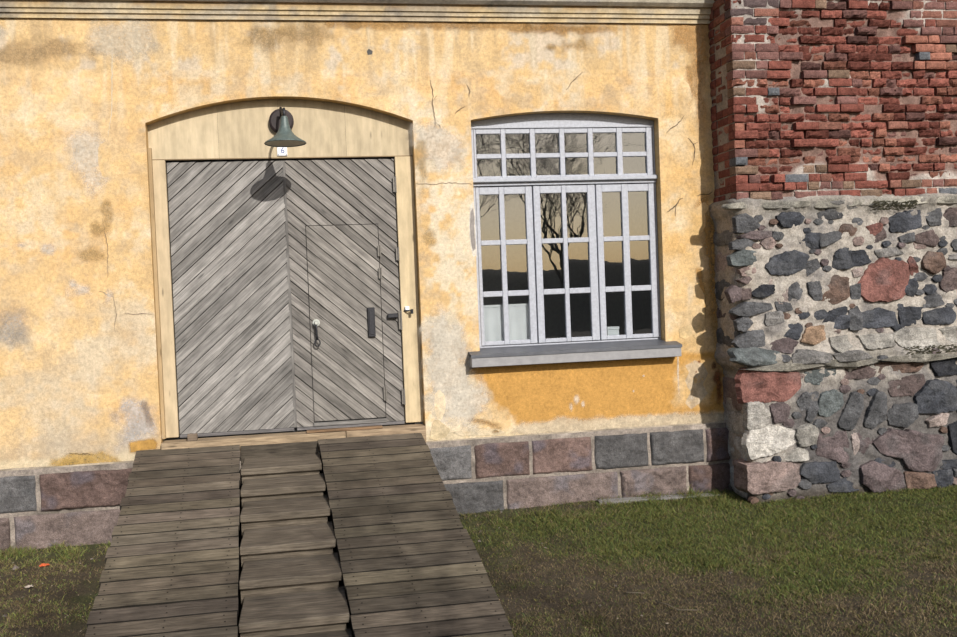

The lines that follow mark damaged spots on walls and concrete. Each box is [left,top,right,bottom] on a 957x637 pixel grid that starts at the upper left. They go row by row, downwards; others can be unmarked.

crack [430,81,470,130]
crack [666,115,698,165]
crack [416,179,472,187]
crack [99,219,152,331]